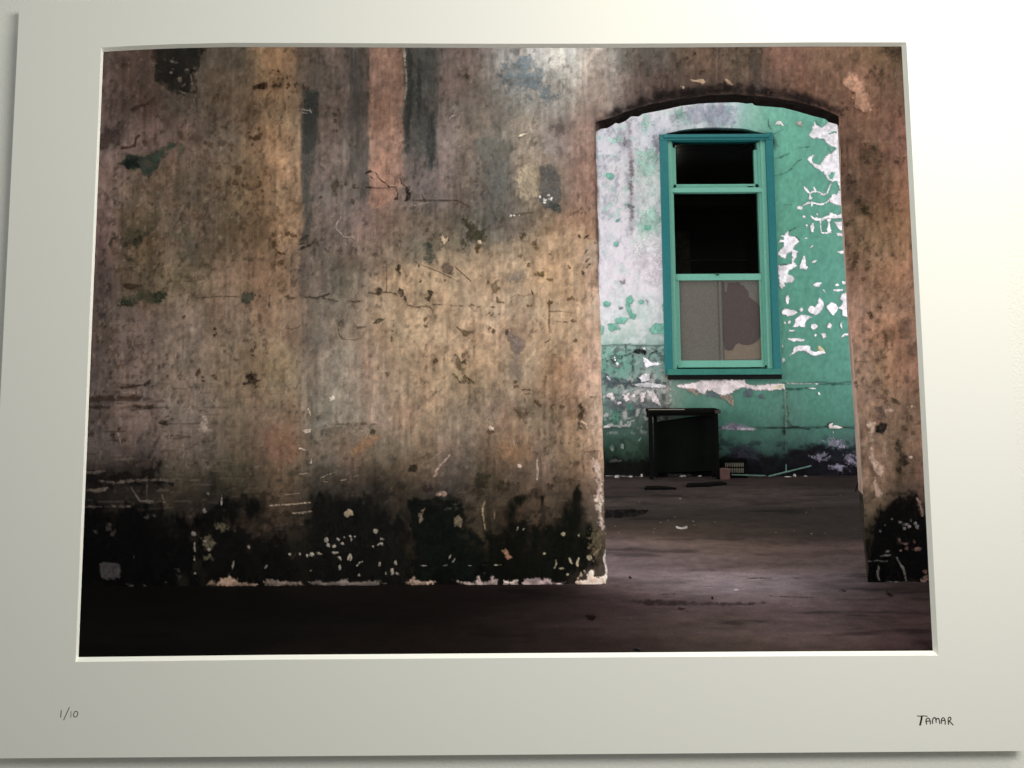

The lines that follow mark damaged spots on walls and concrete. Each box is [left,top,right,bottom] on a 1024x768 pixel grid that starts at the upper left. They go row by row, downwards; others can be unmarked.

water stain [150,48,204,110]
water stain [400,48,443,171]
water stain [285,47,369,299]
peeling [776,118,848,363]
water stain [218,292,270,306]
peeling [601,317,628,335]
flaking render [603,373,820,428]
water stain [724,437,857,476]
water stain [82,460,603,587]
water stain [868,493,929,597]